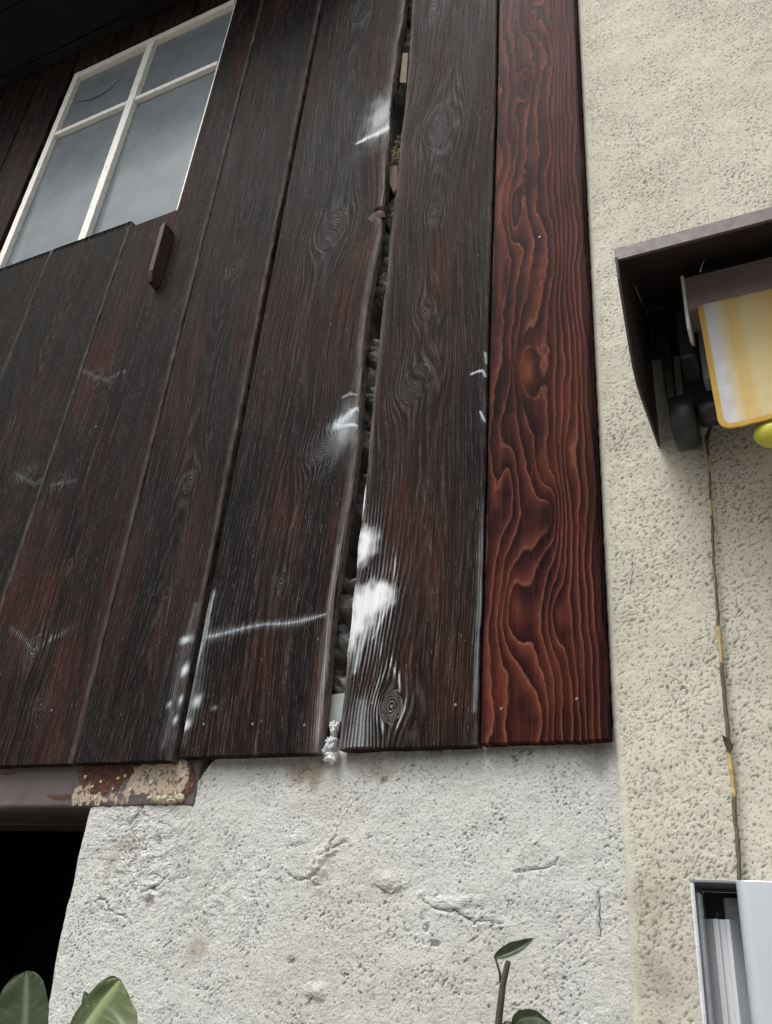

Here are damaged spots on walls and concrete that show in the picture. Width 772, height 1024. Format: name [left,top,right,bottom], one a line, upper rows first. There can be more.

rust [47,765,135,800]
peeling [72,761,190,806]
rust [170,761,196,798]
crack [291,837,347,886]